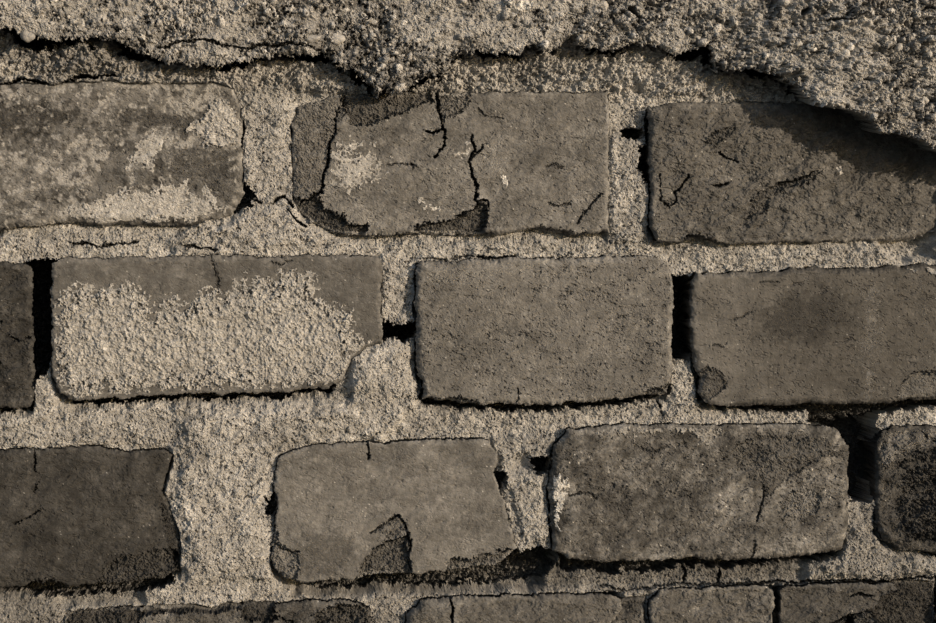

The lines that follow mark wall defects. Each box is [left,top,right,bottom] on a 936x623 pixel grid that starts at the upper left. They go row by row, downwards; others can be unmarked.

peeling [124,128,163,173]
peeling [68,178,228,224]
peeling [186,96,241,149]
peeling [300,140,392,232]
spalling [340,94,472,127]
crack [387,95,447,170]
spalling [413,197,490,232]
crack [468,108,490,207]
peeling [54,269,372,399]
peeling [552,473,570,532]
spalling [894,447,936,545]
spalling [64,603,278,623]